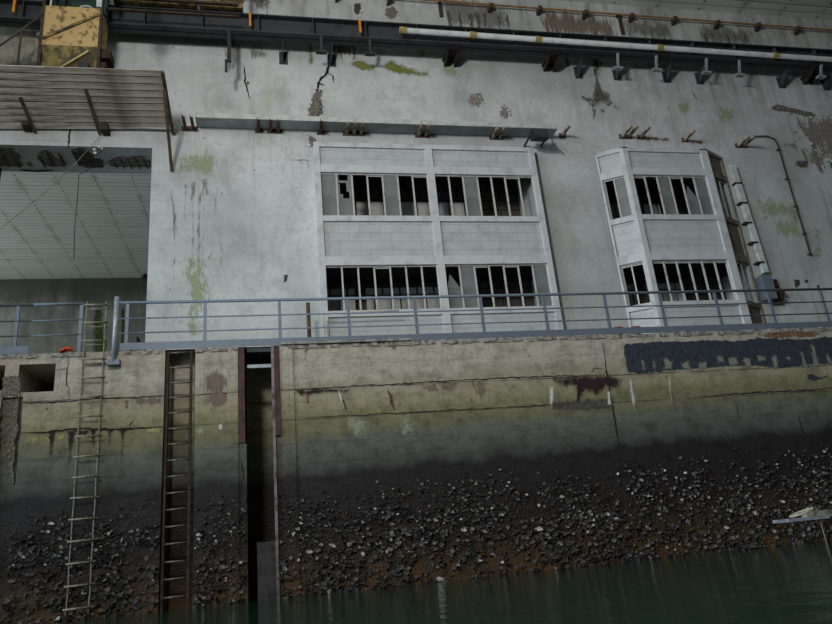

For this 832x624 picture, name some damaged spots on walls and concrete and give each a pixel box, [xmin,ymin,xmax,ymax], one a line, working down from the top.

crack [316,66,334,104]
peeling [772,103,832,173]
spalling [0,376,23,485]
crack [0,357,161,482]
corrosion [67,430,96,457]
leakage [203,371,227,407]
leakage [297,389,368,436]
leakage [549,376,635,410]